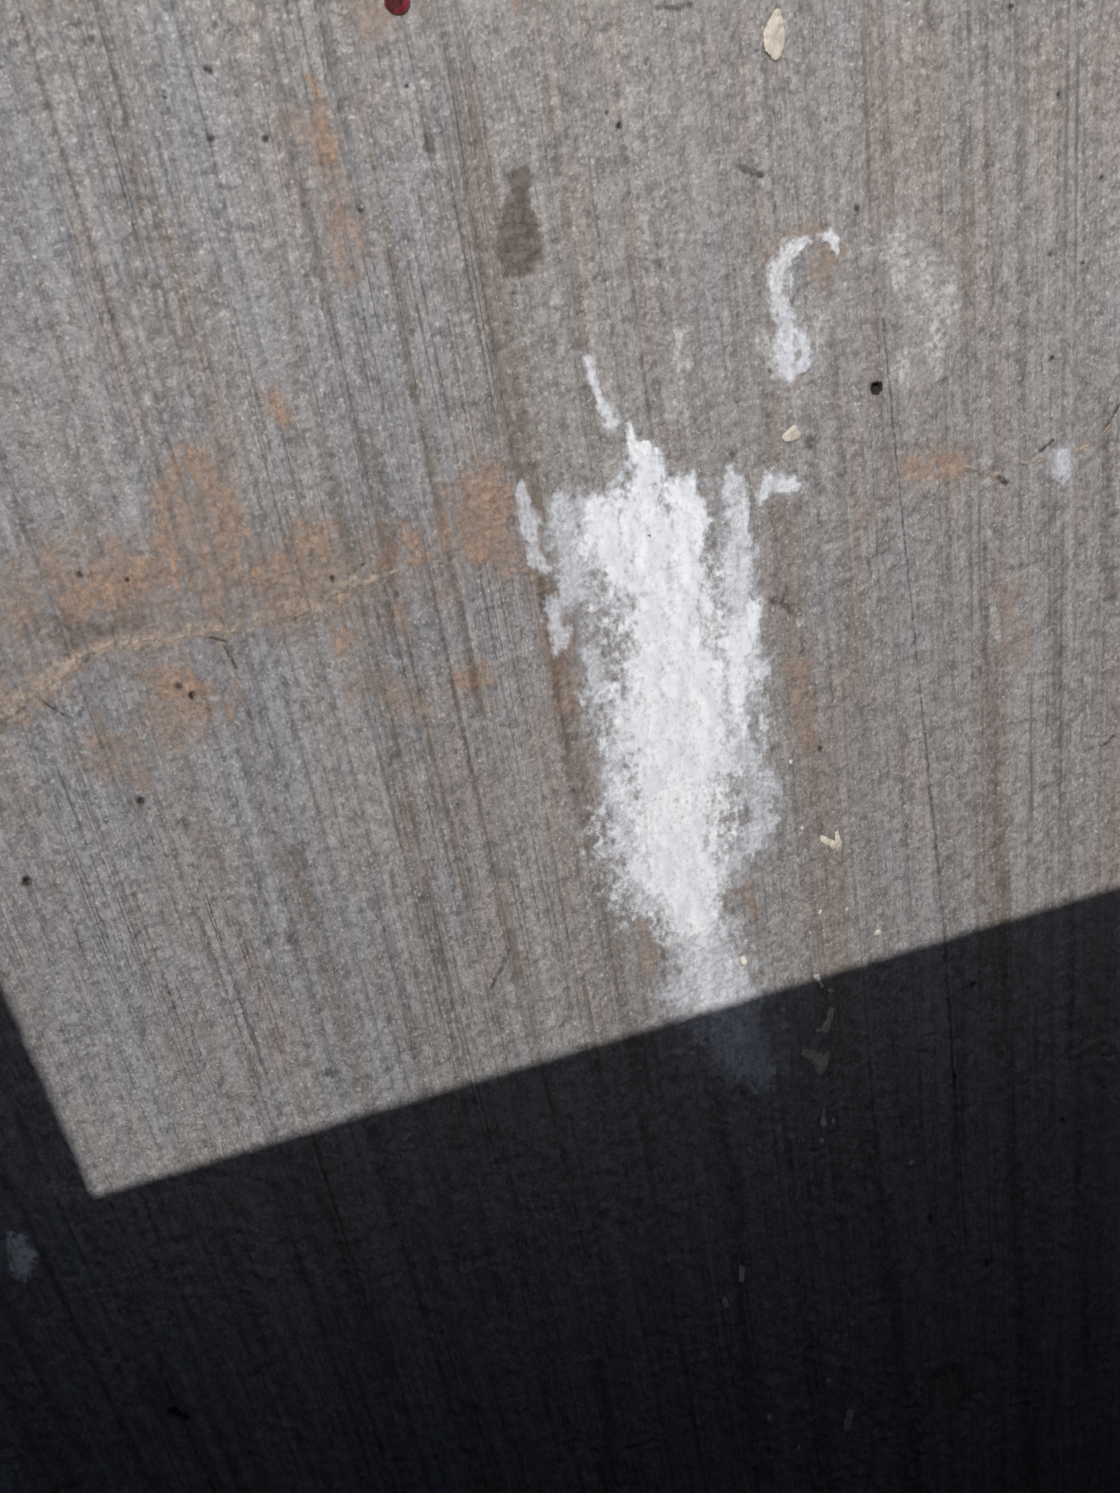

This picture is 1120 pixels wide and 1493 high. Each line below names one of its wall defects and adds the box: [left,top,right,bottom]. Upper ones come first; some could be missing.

water stain [755,229,840,397]
crack [0,563,404,725]
water stain [516,356,801,1110]